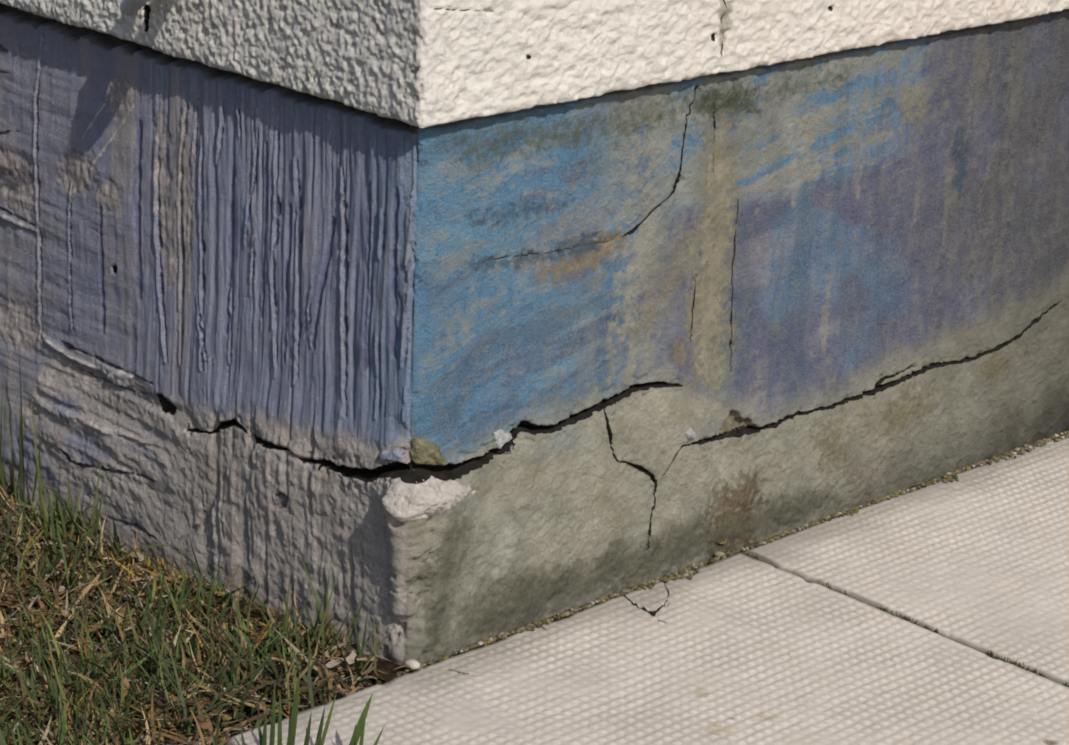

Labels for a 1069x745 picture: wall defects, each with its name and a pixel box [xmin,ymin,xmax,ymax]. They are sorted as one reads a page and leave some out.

crack [487,86,716,260]
crack [689,277,697,340]
crack [729,199,739,373]
peeling [107,370,134,388]
spalling [156,394,177,415]
peeling [379,449,407,462]
crack [187,299,1062,549]
spalling [274,492,288,508]
spalling [371,475,476,522]
damp [707,474,762,554]